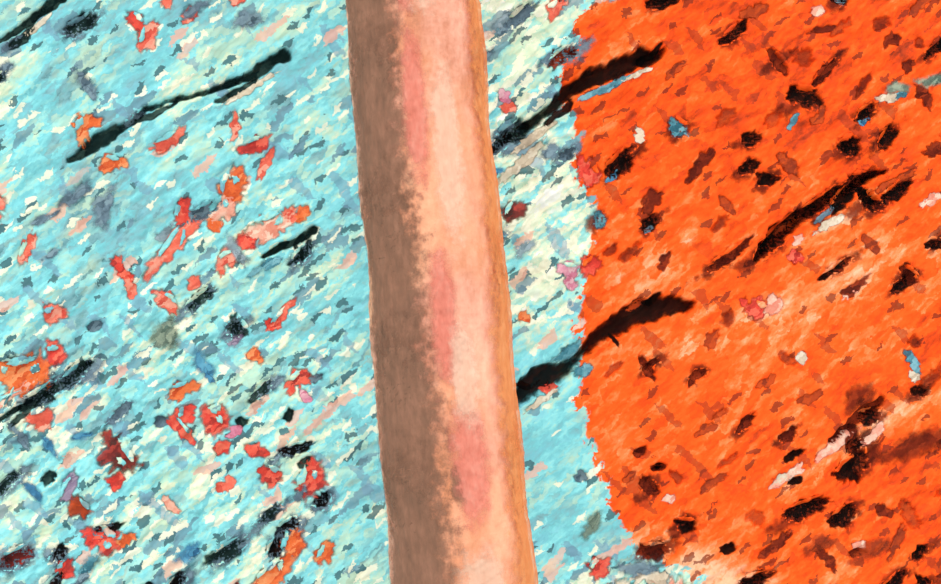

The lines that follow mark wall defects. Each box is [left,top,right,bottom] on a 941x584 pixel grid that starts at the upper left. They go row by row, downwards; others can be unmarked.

crack [0,0,66,49]
peeling [71,113,102,149]
crack [67,49,290,162]
crack [492,42,664,153]
crack [754,170,885,261]
crack [0,362,86,427]
peeling [0,339,103,431]
peeling [43,302,68,326]
spalling [87,321,102,332]
crack [516,292,693,402]